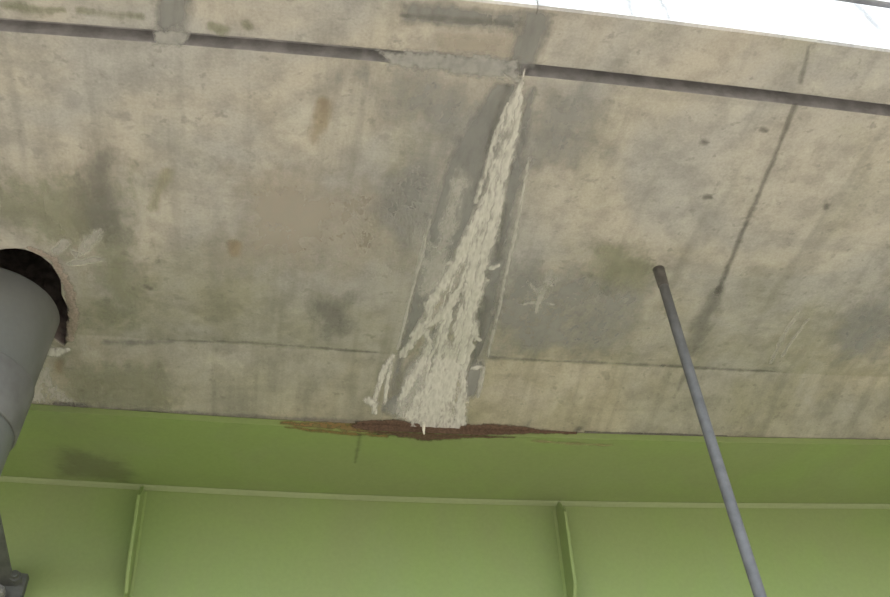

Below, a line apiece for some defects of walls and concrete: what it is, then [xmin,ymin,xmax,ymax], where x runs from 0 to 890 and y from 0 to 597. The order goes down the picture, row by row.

rust [280,420,577,441]
water stain [364,4,636,435]